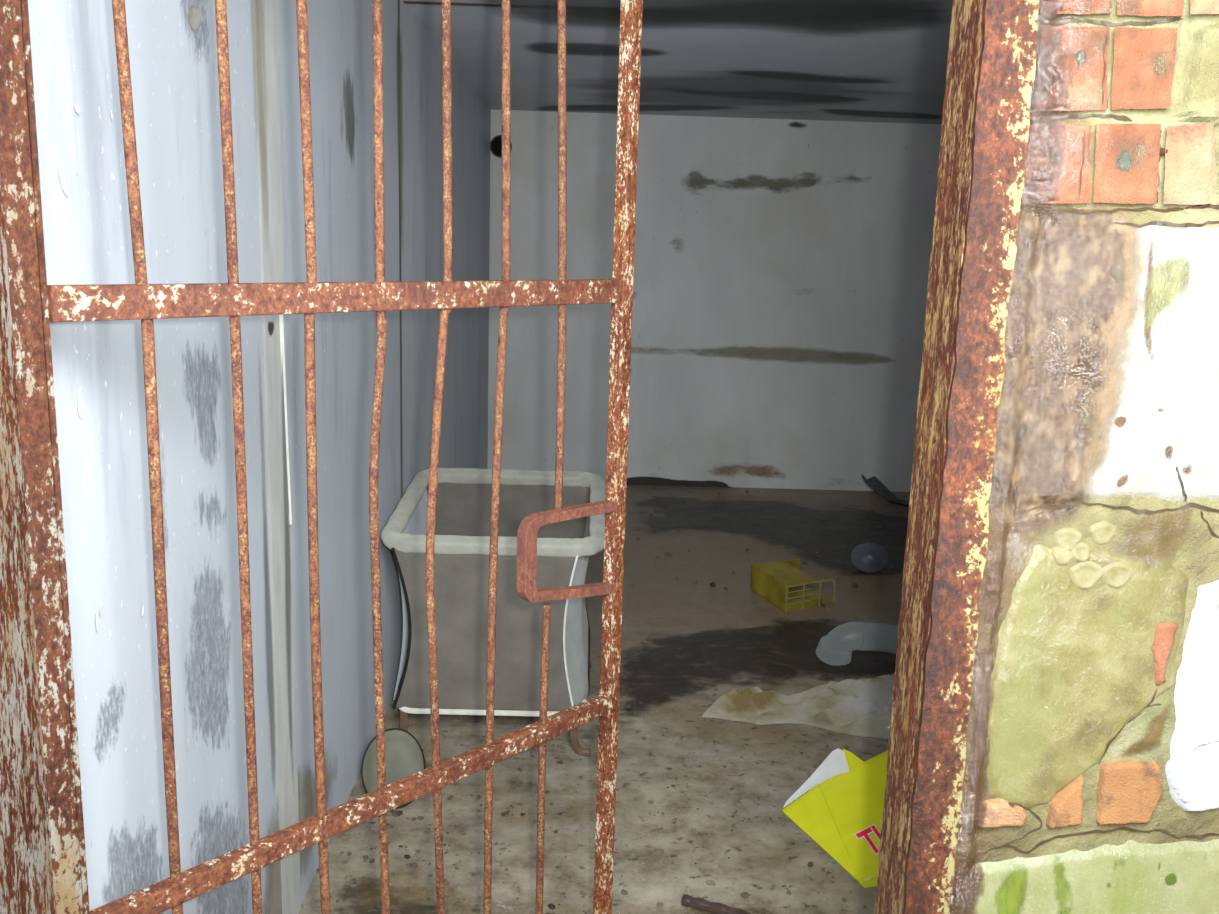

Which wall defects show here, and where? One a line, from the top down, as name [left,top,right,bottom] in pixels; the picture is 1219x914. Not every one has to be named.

leakage [499,0,621,26]
leakage [642,0,932,32]
leakage [532,44,619,56]
leakage [639,71,942,119]
spalling [1022,0,1219,205]
leakage [687,172,817,191]
crack [1020,467,1219,538]
peeling [1046,580,1219,828]
rust [970,651,992,844]
crack [980,802,1219,856]
leakage [996,869,1027,914]
leakage [1055,860,1070,914]